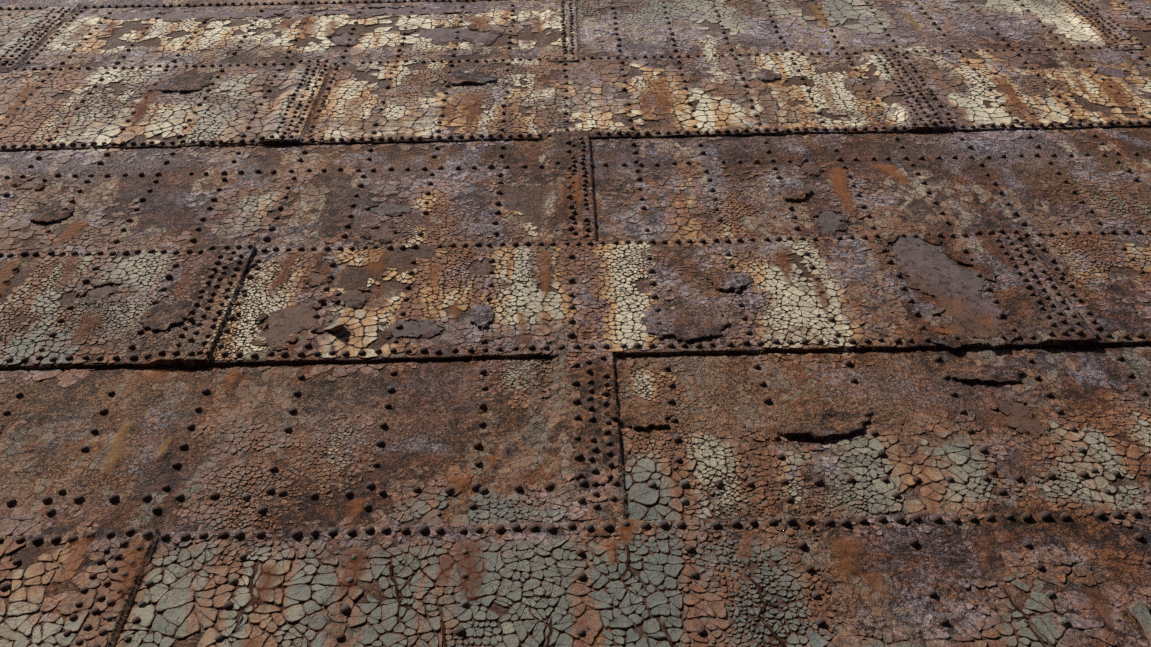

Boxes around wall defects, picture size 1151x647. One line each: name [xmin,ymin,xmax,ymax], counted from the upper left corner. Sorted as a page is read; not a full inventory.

peeling [0,0,1151,166]
peeling [0,153,1151,647]
crack [238,566,272,625]
crack [389,557,413,608]
crack [409,616,447,647]
crack [520,615,552,647]
crack [620,544,640,582]
crack [651,623,674,647]
crack [742,572,787,647]
crack [1003,587,1045,647]